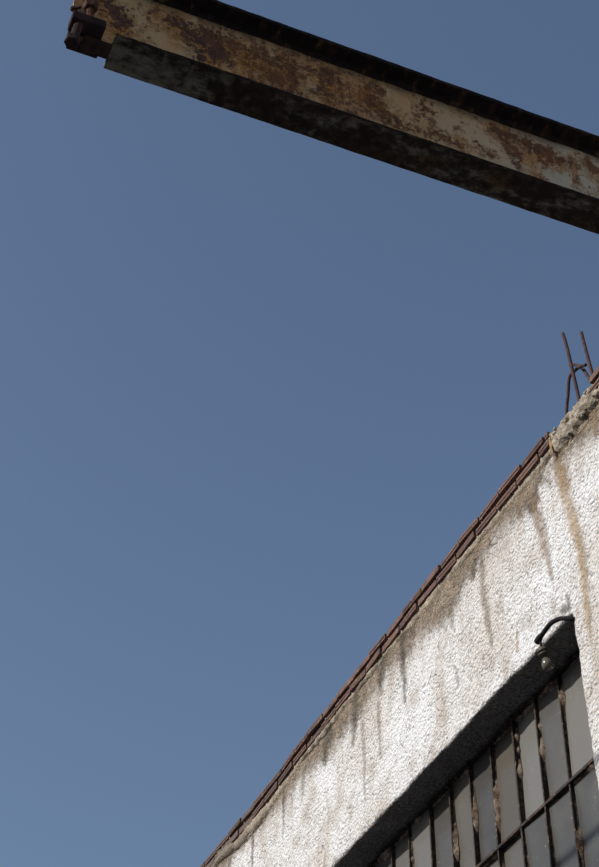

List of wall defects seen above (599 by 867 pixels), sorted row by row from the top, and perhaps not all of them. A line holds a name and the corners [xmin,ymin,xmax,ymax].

corrosion [95,0,135,38]
corrosion [155,11,419,132]
corrosion [432,122,599,192]
spalling [548,384,599,456]
water stain [218,401,599,867]